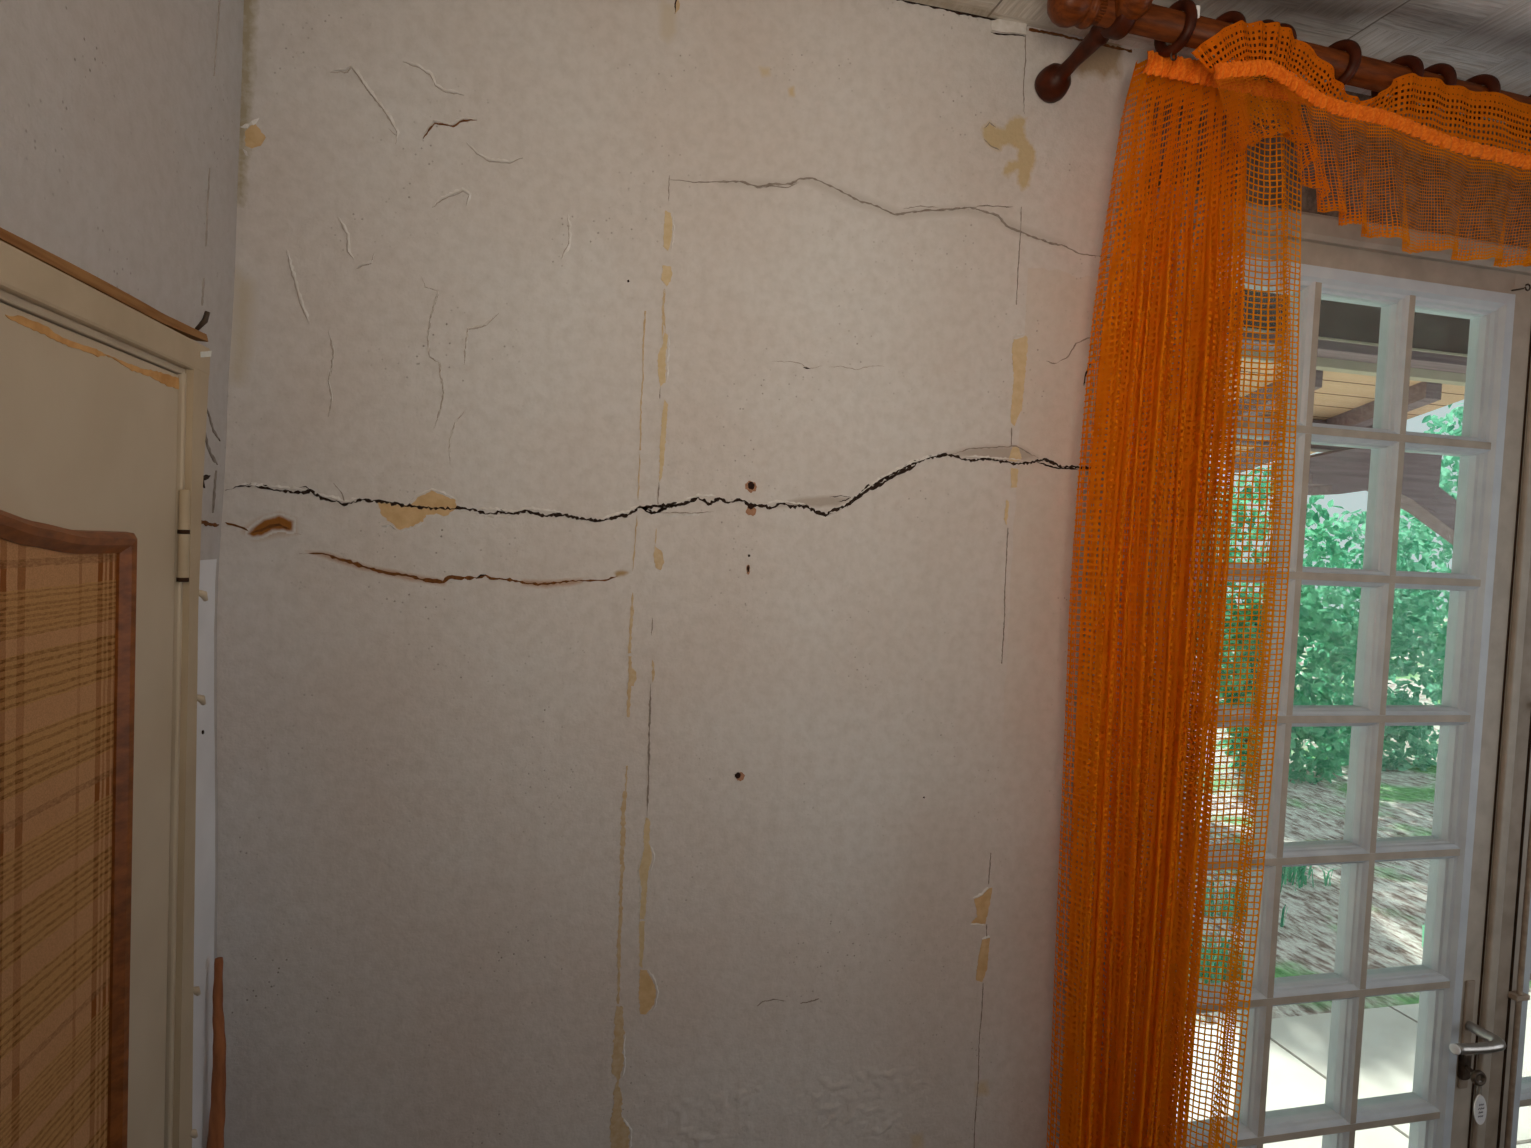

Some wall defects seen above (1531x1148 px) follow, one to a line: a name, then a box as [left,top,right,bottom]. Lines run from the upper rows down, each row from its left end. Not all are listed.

peeling [978,112,1039,194]
peeling [661,210,672,286]
crack [670,169,1110,258]
peeling [657,333,668,481]
crack [203,408,1131,522]
peeling [378,488,456,532]
crack [302,548,632,591]
peeling [971,887,992,982]
peeling [609,818,659,1148]